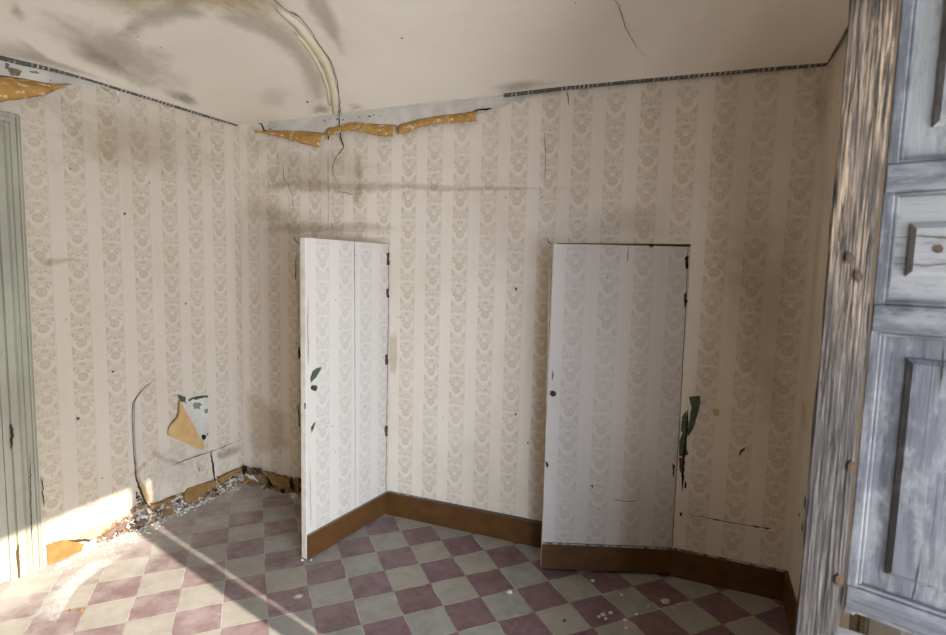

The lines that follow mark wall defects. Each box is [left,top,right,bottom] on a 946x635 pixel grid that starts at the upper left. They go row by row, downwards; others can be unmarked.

flaking render [0,60,96,85]
crack [275,0,357,195]
flaking render [258,91,554,140]
crack [132,380,155,505]
crack [164,441,237,481]
peeling [46,465,300,565]